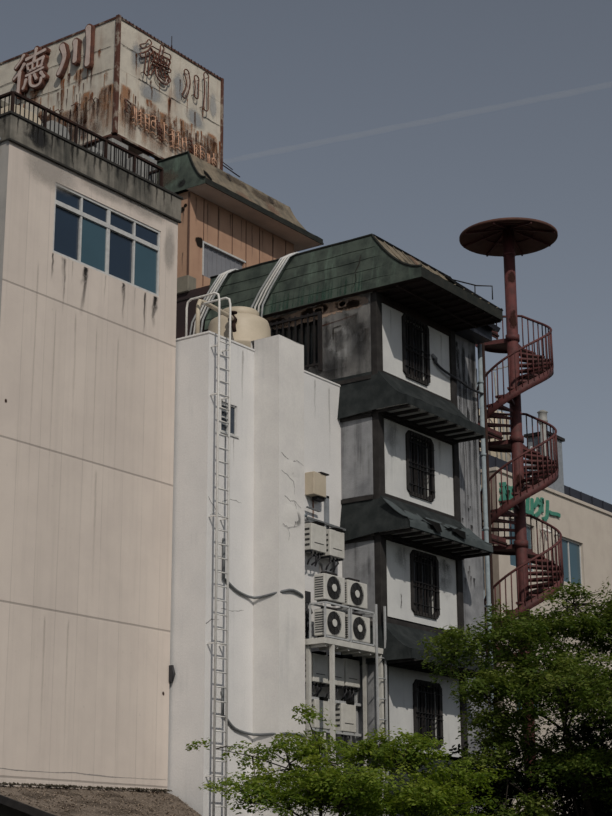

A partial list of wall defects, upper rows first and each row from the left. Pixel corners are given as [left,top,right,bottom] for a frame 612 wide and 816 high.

spalling [264,296,368,329]